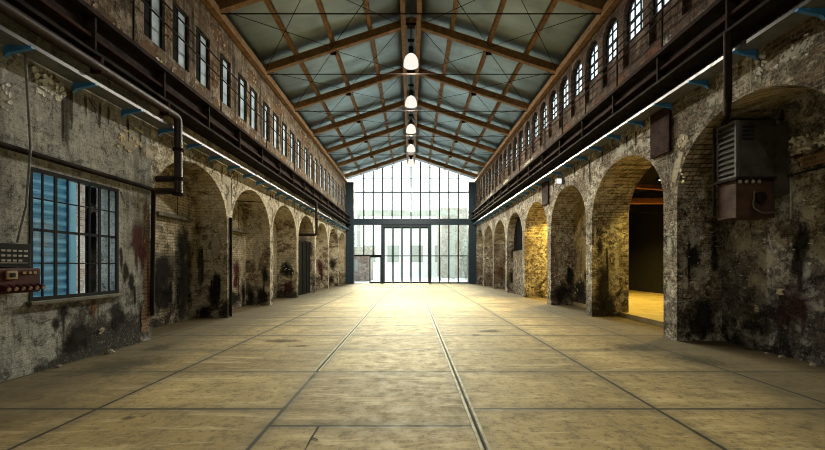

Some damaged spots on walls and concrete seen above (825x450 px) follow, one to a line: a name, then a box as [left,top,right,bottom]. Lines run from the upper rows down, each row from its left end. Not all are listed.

peeling [29,66,67,104]
leakage [775,198,825,335]
leakage [53,305,91,353]
leakage [112,304,125,333]